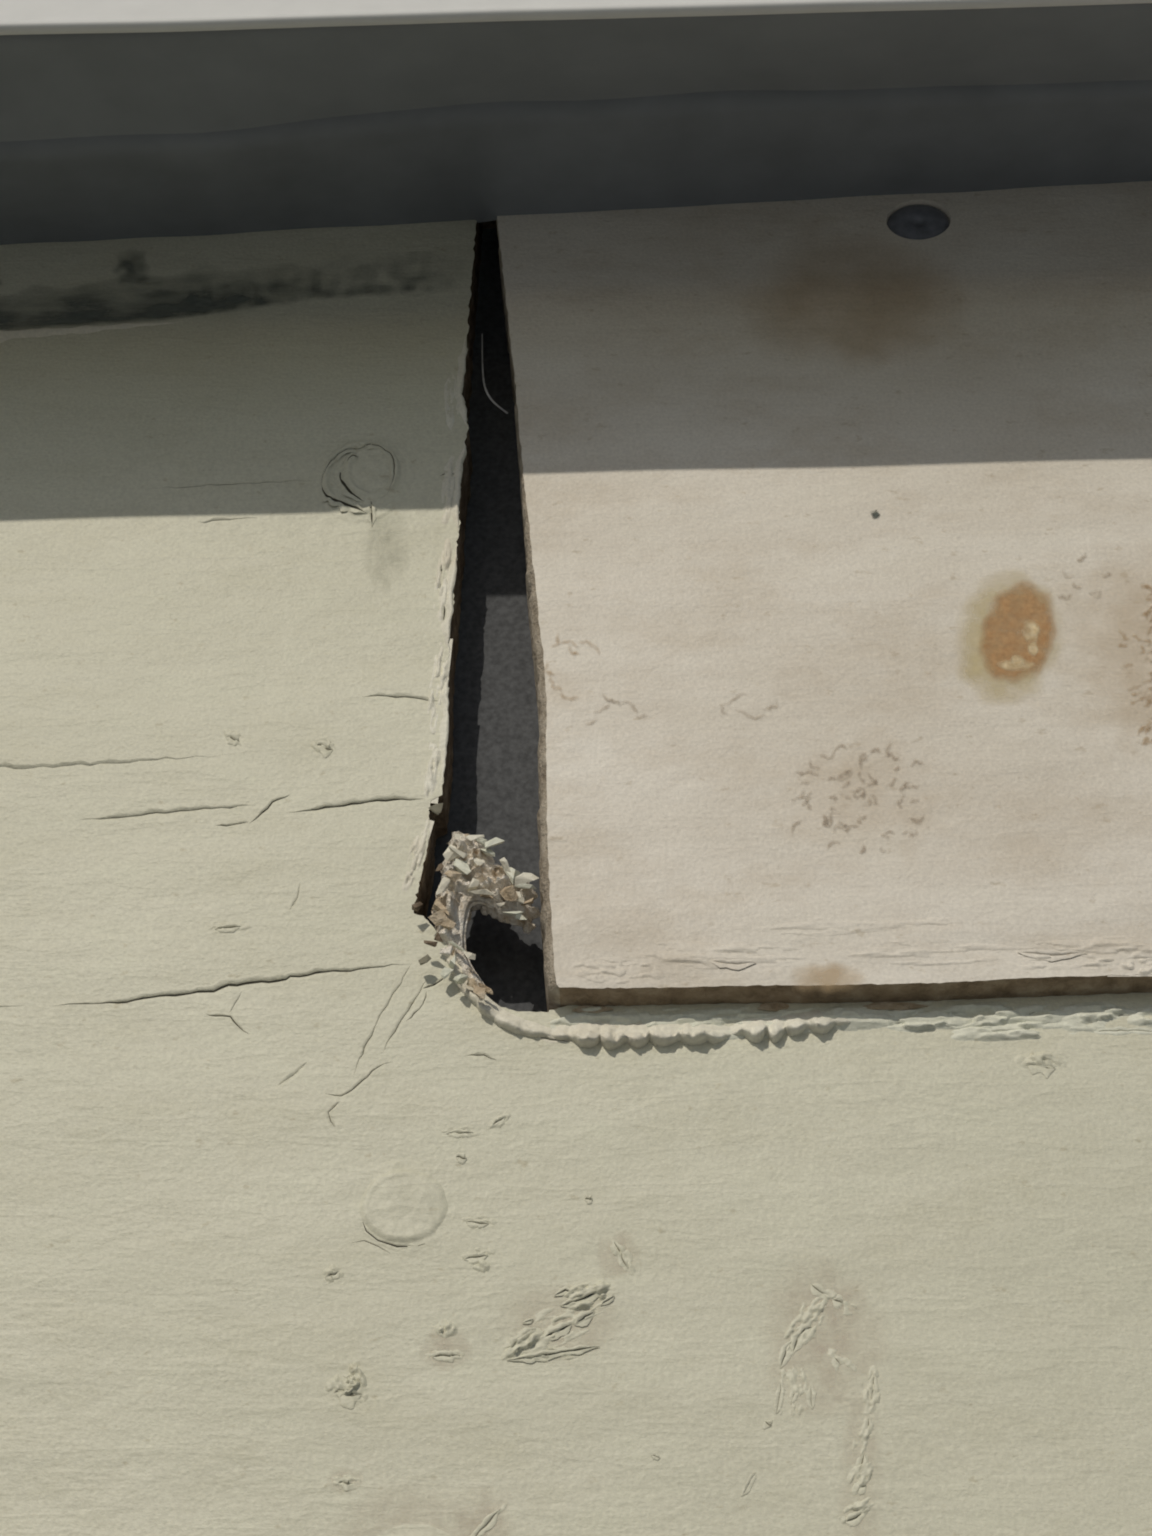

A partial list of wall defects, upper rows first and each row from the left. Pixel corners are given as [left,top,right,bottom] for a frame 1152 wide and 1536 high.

water stain [0,283,285,329]
rust [967,589,1052,685]
crack [364,691,437,703]
peeling [402,335,1152,1078]
crack [0,754,224,772]
crack [75,792,422,829]
crack [0,964,409,1034]
peeling [501,1280,616,1363]
peeling [762,1283,881,1527]